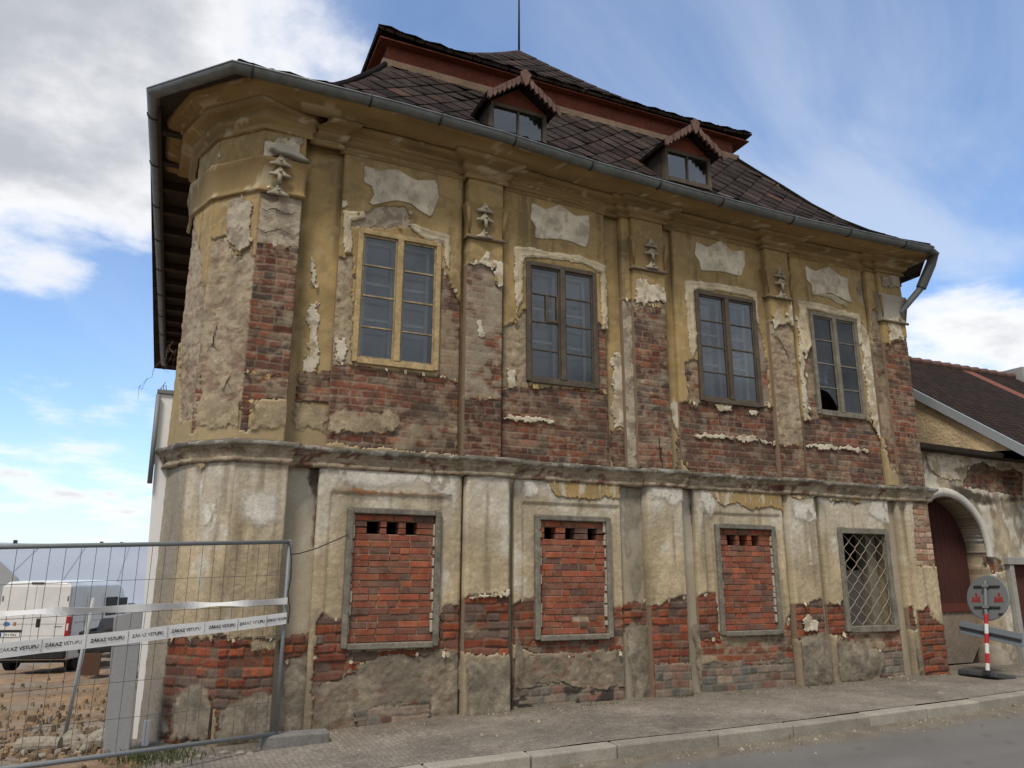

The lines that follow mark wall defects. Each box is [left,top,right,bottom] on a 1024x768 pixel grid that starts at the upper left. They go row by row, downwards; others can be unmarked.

spalling [177,185,1024,496]
peeling [546,477,620,501]
spalling [157,589,950,744]